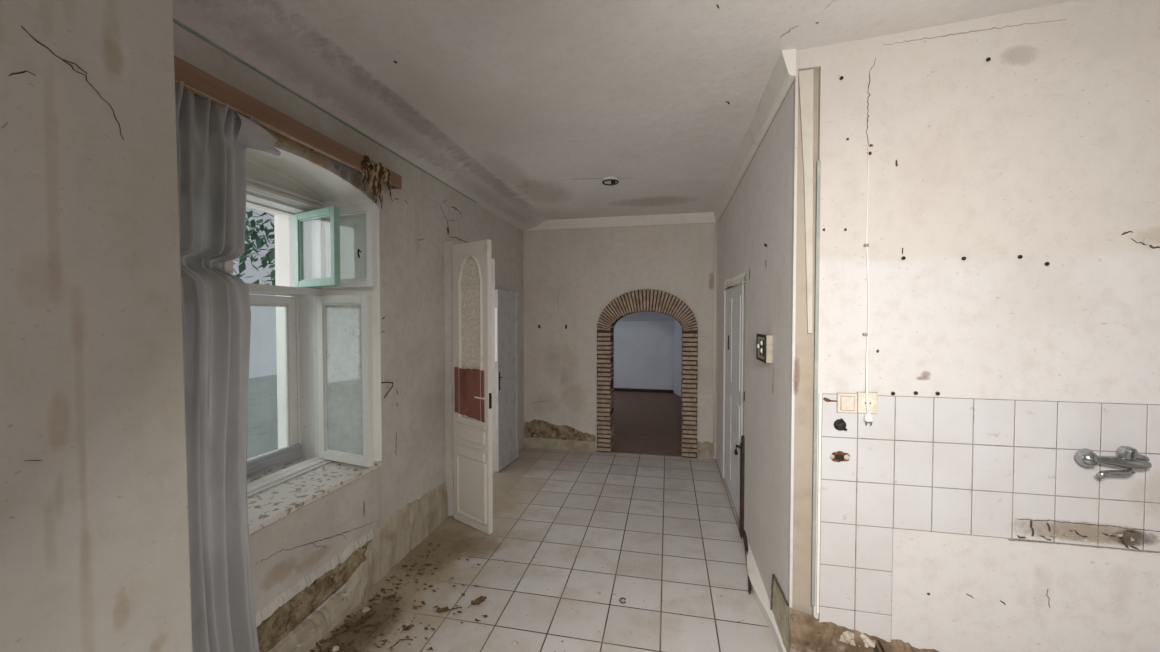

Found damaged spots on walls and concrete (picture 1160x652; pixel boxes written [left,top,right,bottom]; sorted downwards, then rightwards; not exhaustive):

crack [9,26,124,140]
peeling [1121,231,1160,249]
flaking render [523,416,596,442]
flaking render [255,529,379,652]
flaking render [840,631,886,652]